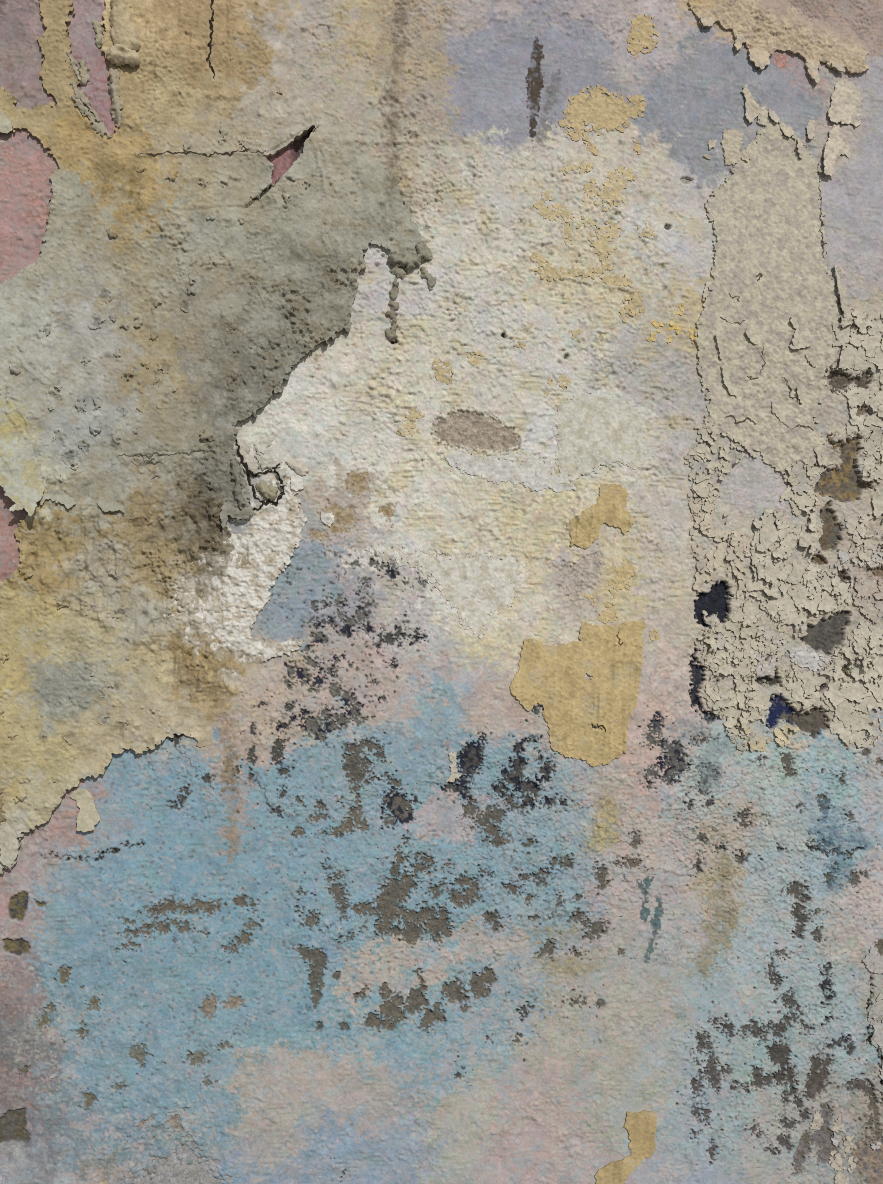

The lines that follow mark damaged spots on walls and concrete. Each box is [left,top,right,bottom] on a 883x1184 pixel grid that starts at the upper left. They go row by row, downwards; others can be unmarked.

crack [138,148,266,157]
crack [250,181,277,200]
crack [118,449,205,465]
peeling [0,0,428,874]
crack [235,440,285,520]
peeling [639,0,883,810]
peeling [437,733,572,854]
peeling [118,888,264,963]
peeling [315,837,610,962]
peeling [780,881,822,942]
peeling [296,944,340,1029]
peeling [354,967,496,1032]